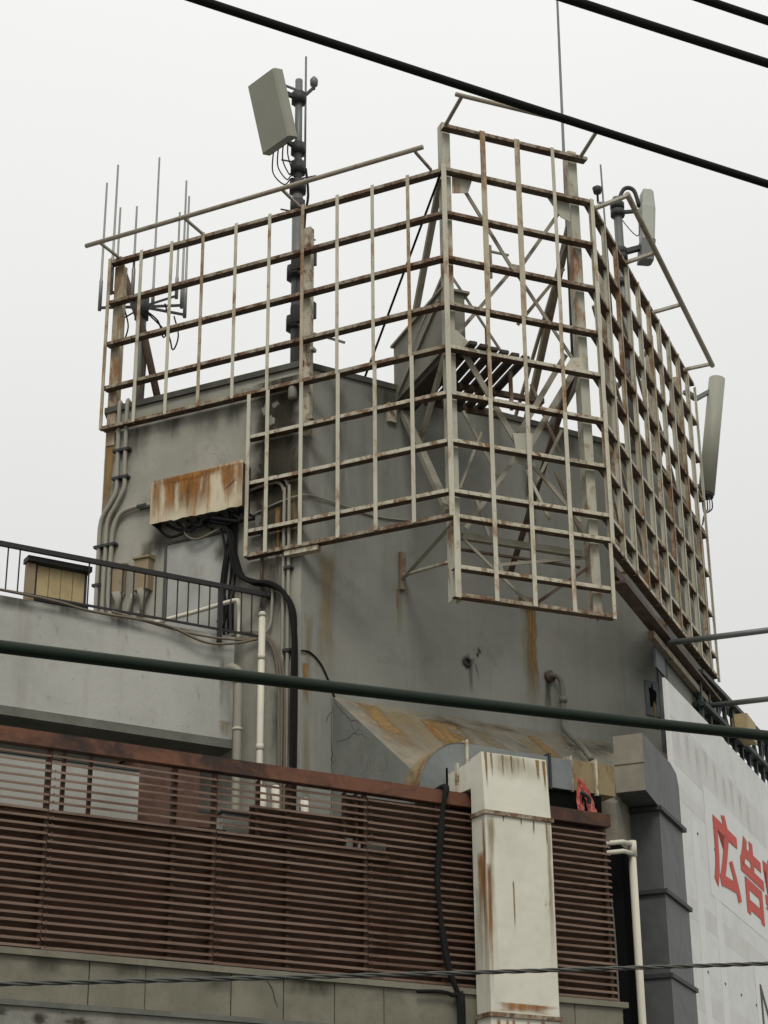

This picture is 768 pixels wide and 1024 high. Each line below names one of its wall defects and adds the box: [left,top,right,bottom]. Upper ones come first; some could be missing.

corrosion [527,609,538,677]
crack [326,698,366,815]
corrosion [358,703,562,784]
corrosion [478,816,504,936]
corrosion [498,1003,547,1024]